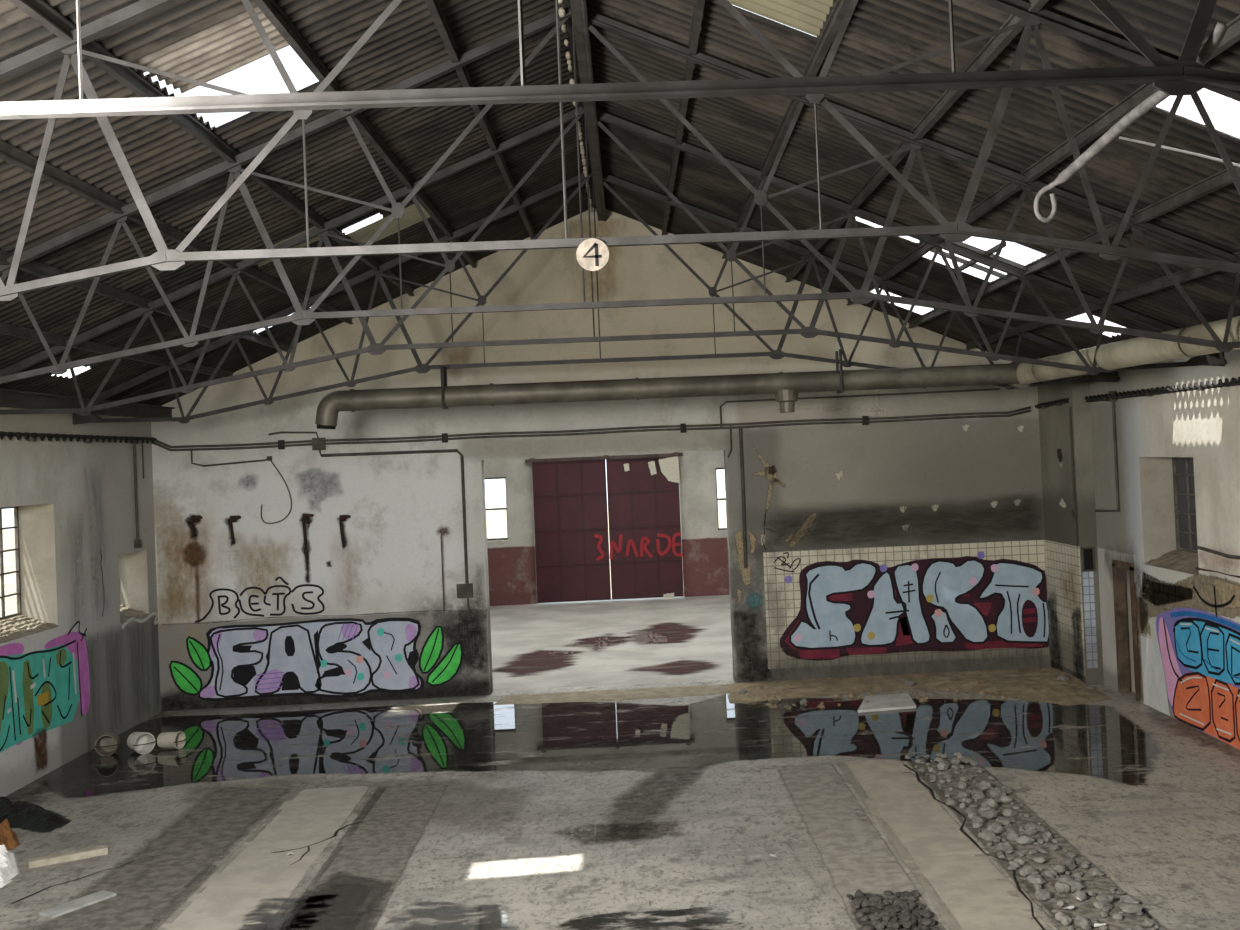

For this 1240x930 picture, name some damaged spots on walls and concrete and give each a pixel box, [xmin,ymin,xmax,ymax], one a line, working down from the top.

corrosion [185,515,205,620]